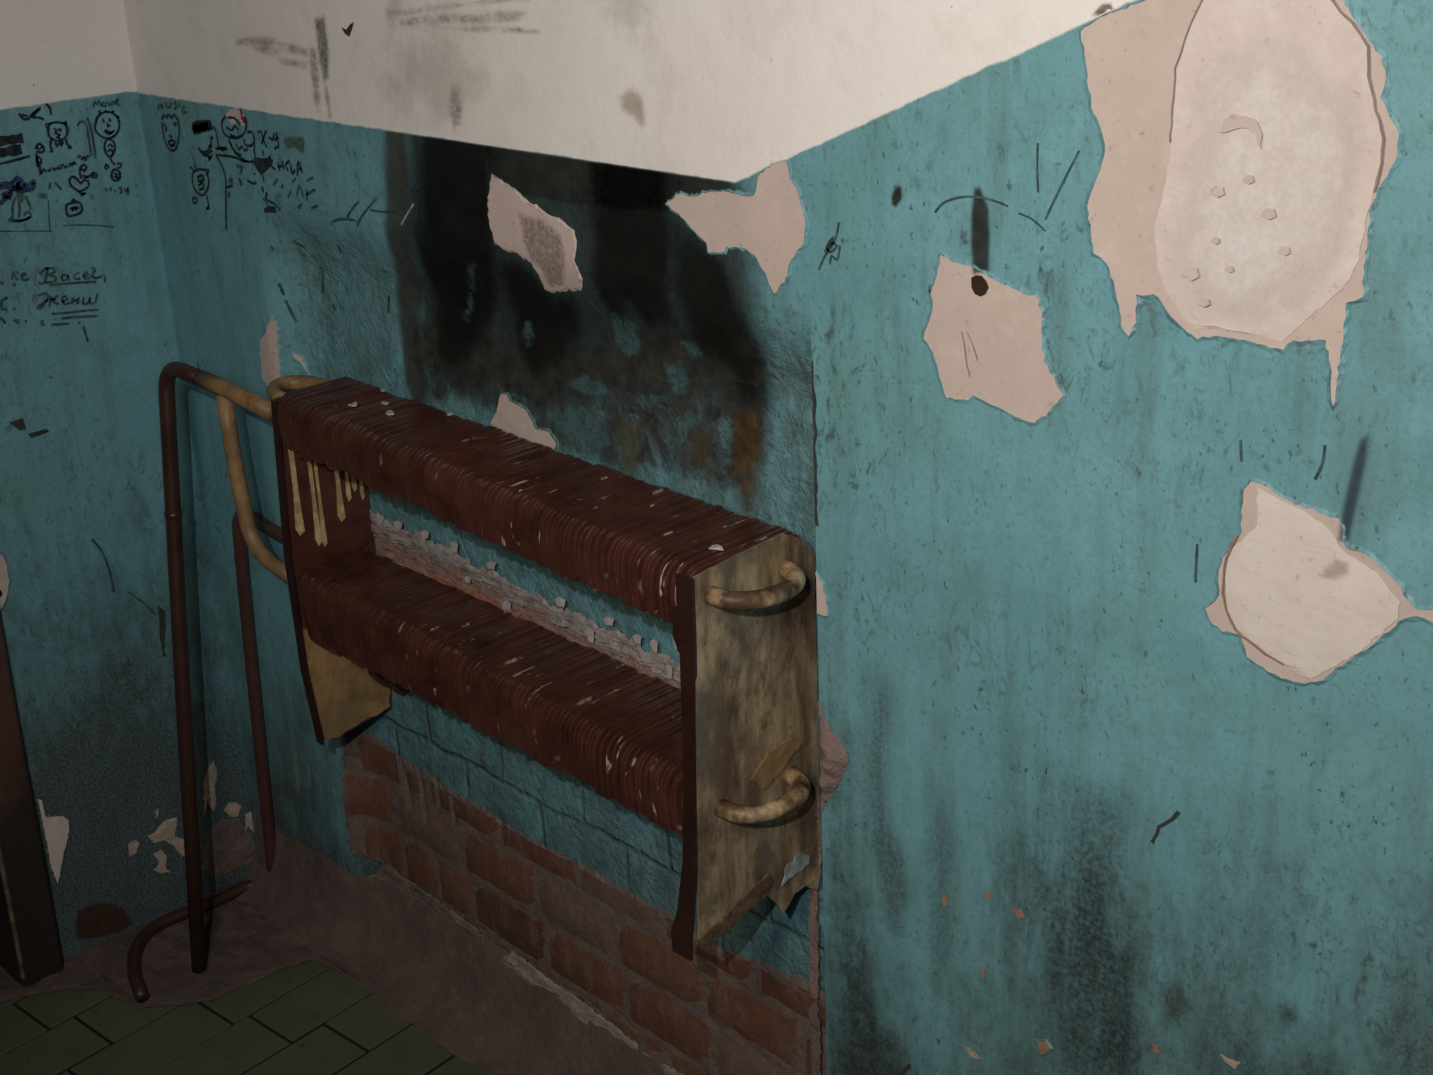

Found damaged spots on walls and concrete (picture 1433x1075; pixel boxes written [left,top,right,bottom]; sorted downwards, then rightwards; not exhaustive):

water stain [625,95,642,118]
peeling [487,174,583,293]
peeling [665,156,810,297]
peeling [1078,0,1404,411]
peeling [921,249,1067,427]
peeling [490,392,560,452]
peeling [1202,477,1433,687]
peeling [128,809,185,873]
peeling [202,760,256,878]
flaking render [342,729,827,1075]
peeling [1035,1037,1054,1056]
peeling [1220,1053,1241,1069]